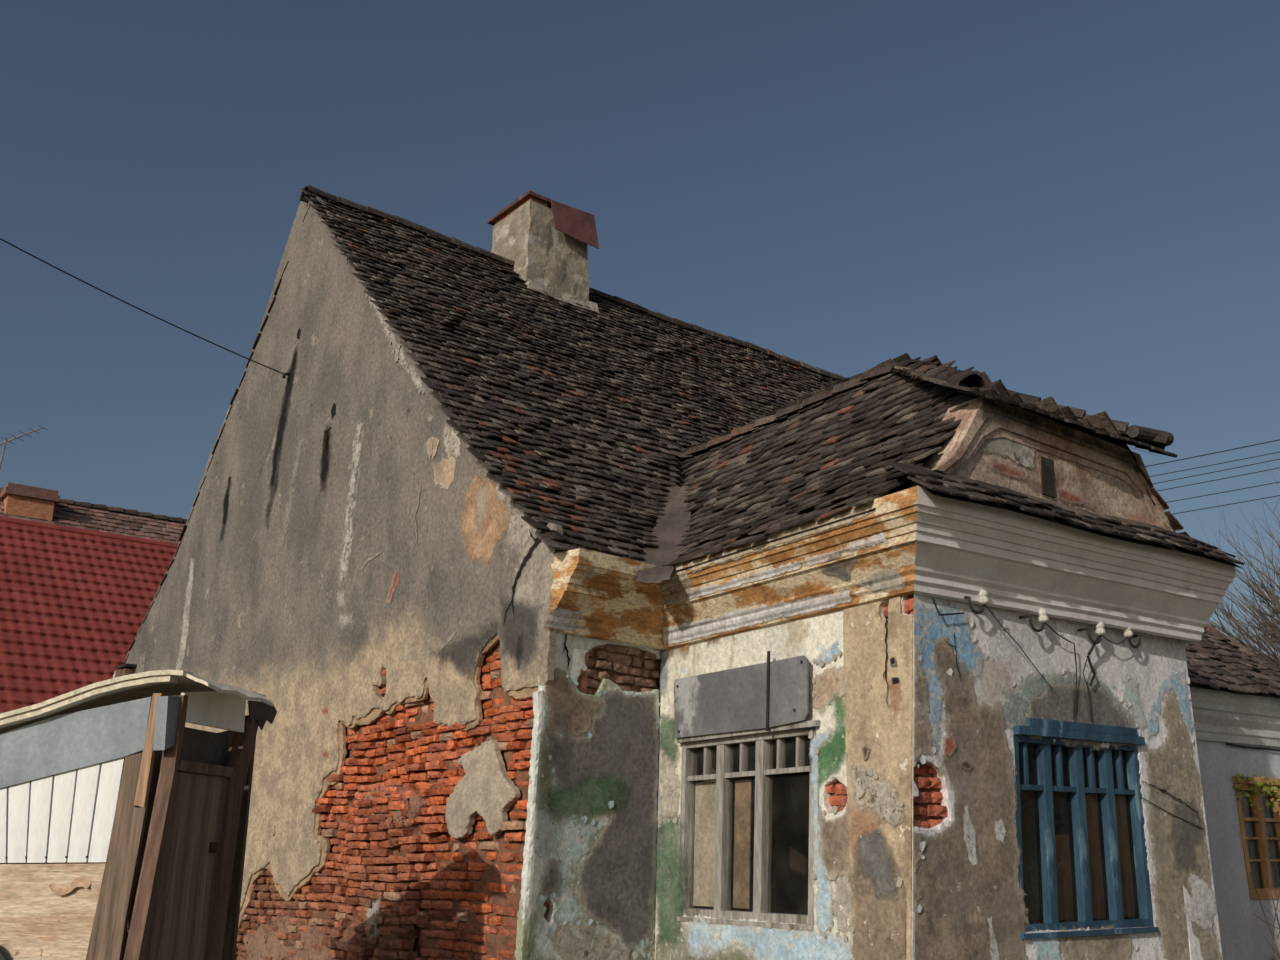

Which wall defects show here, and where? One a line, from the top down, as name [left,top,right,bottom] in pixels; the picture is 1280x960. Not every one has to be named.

leakage [220,483,230,539]
leakage [265,349,303,549]
flaking render [426,424,461,490]
crack [503,514,571,626]
flaking render [235,505,1222,960]